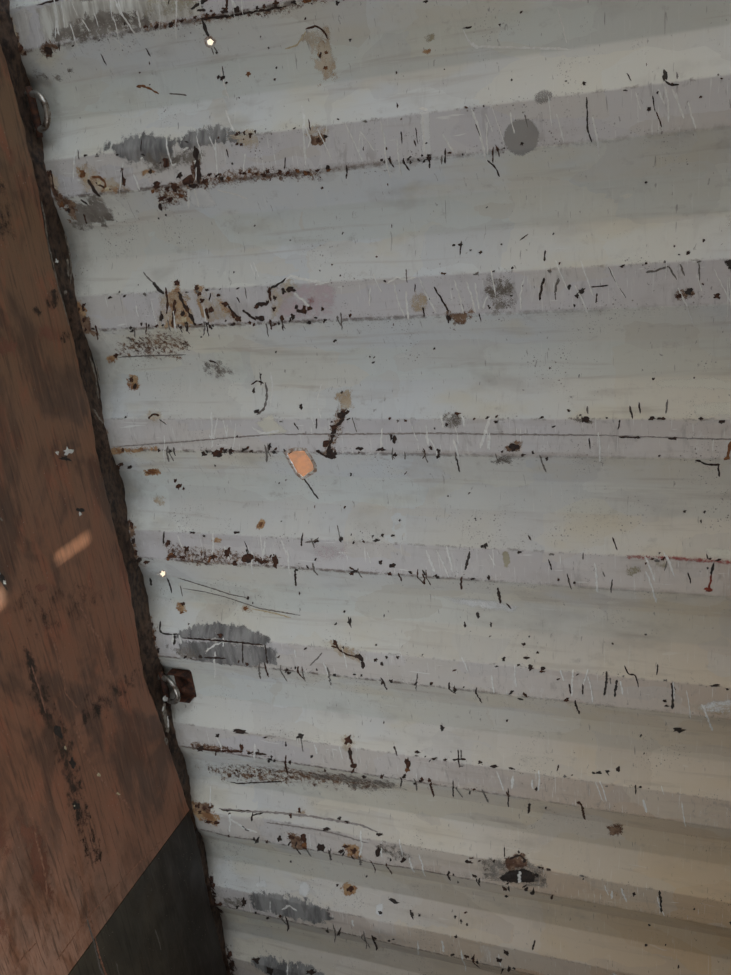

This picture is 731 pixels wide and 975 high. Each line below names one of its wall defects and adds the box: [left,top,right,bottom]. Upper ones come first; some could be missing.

rust [143,0,344,31]
rust [285,24,338,86]
rust [143,272,336,330]
rust [106,353,184,363]
rust [158,538,279,569]
spalling [238,655,305,681]